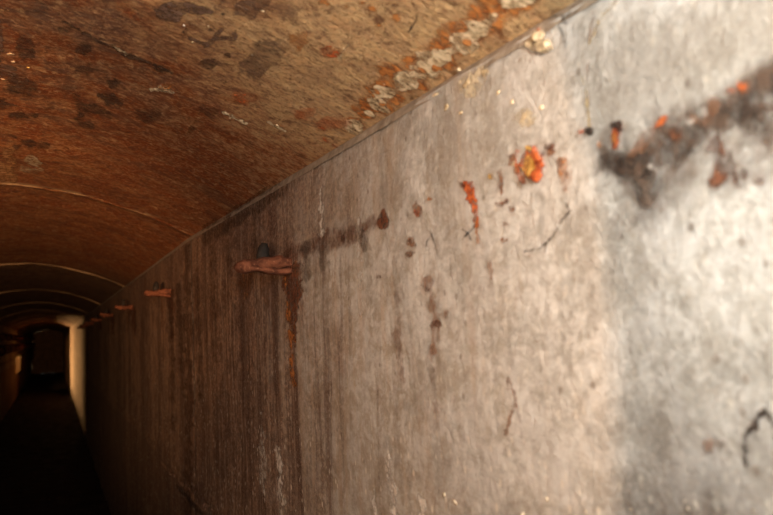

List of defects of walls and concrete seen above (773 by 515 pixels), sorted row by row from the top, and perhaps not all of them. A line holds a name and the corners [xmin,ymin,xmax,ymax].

peeling [345,0,537,135]
corrosion [509,154,520,174]
corrosion [610,120,623,150]
damp [599,64,773,208]
corrosion [460,181,479,243]
corrosion [282,262,302,387]
crack [742,408,772,467]
efflorescence [259,447,286,515]